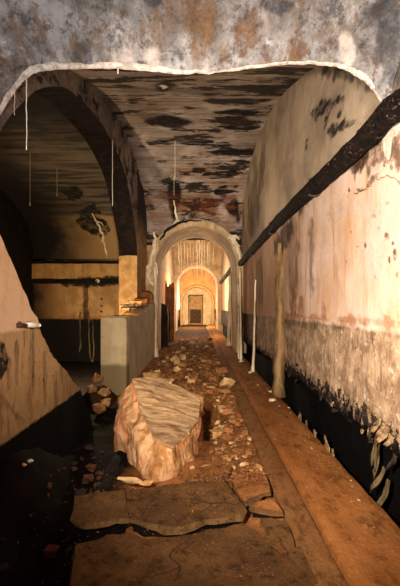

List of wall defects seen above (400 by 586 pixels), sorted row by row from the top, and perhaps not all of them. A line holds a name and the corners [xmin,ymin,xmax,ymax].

mould [76,204,110,238]
flaking render [286,359,398,506]